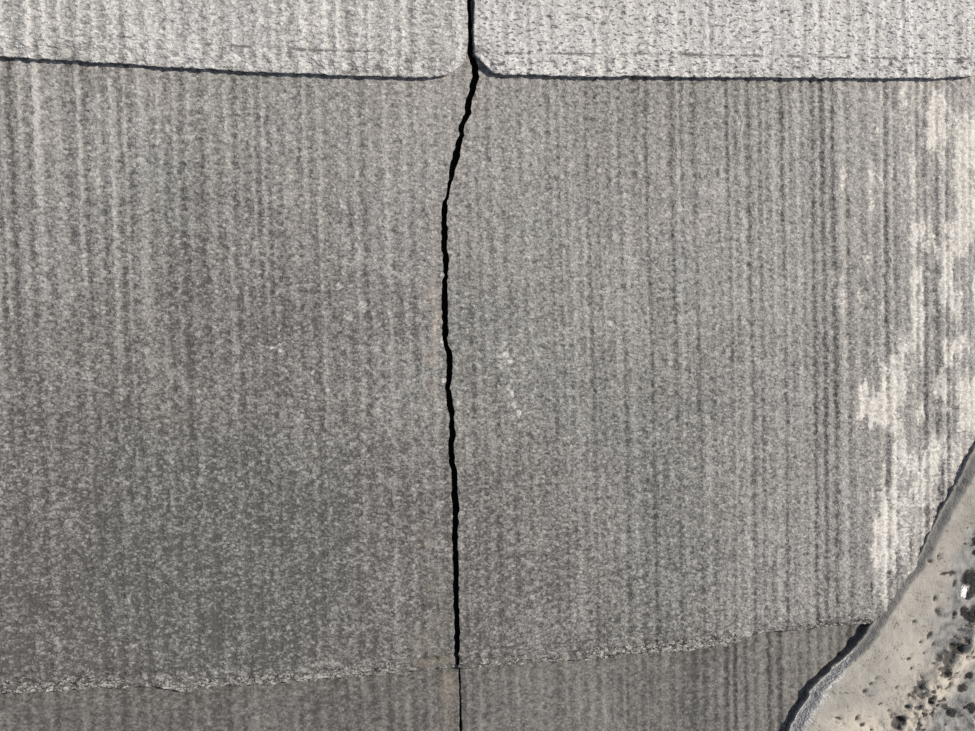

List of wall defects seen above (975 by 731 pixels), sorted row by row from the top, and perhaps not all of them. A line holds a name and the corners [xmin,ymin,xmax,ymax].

crack [393,0,479,667]
peeling [785,78,975,632]
spalling [952,637,975,659]